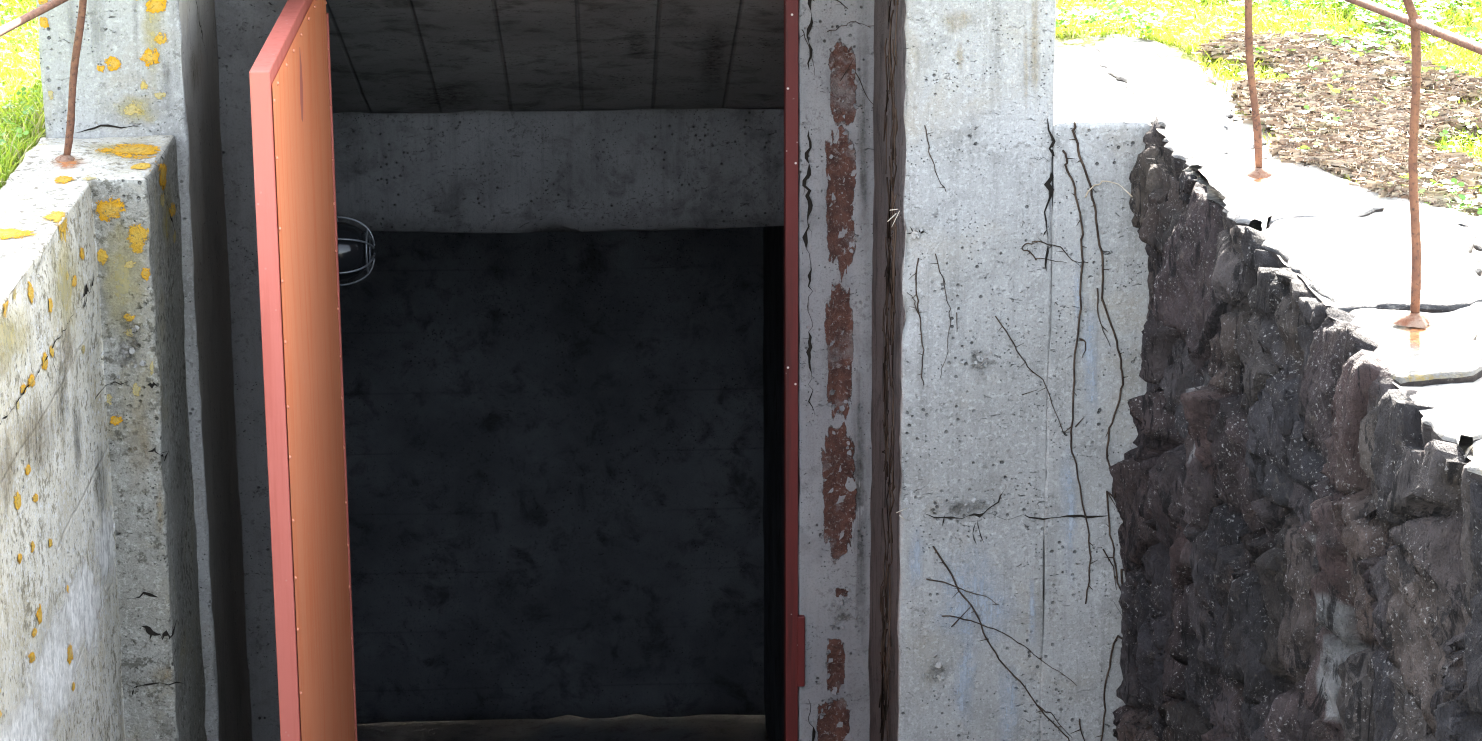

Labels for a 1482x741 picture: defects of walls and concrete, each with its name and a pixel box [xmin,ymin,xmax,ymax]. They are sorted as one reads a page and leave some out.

crack [0,277,94,425]
crack [924,491,1104,545]